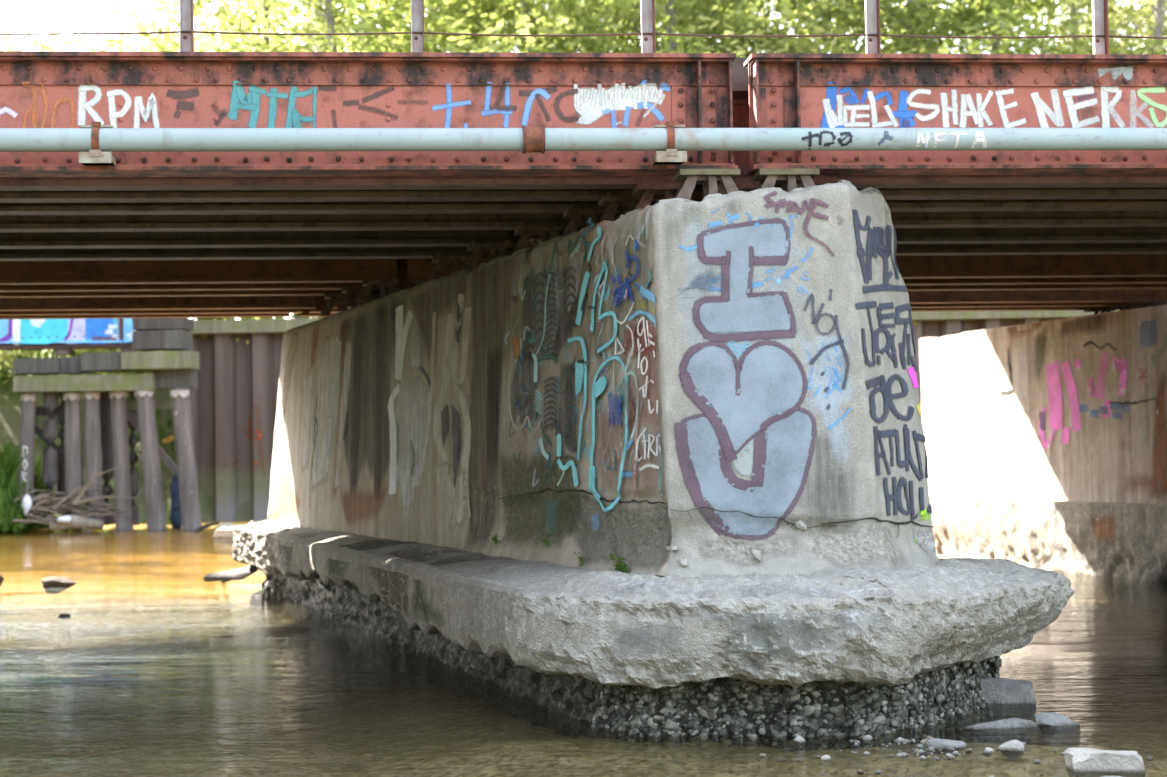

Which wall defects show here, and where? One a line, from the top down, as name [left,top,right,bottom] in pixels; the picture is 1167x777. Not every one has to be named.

leakage [303,257,512,543]
crack [500,488,934,538]